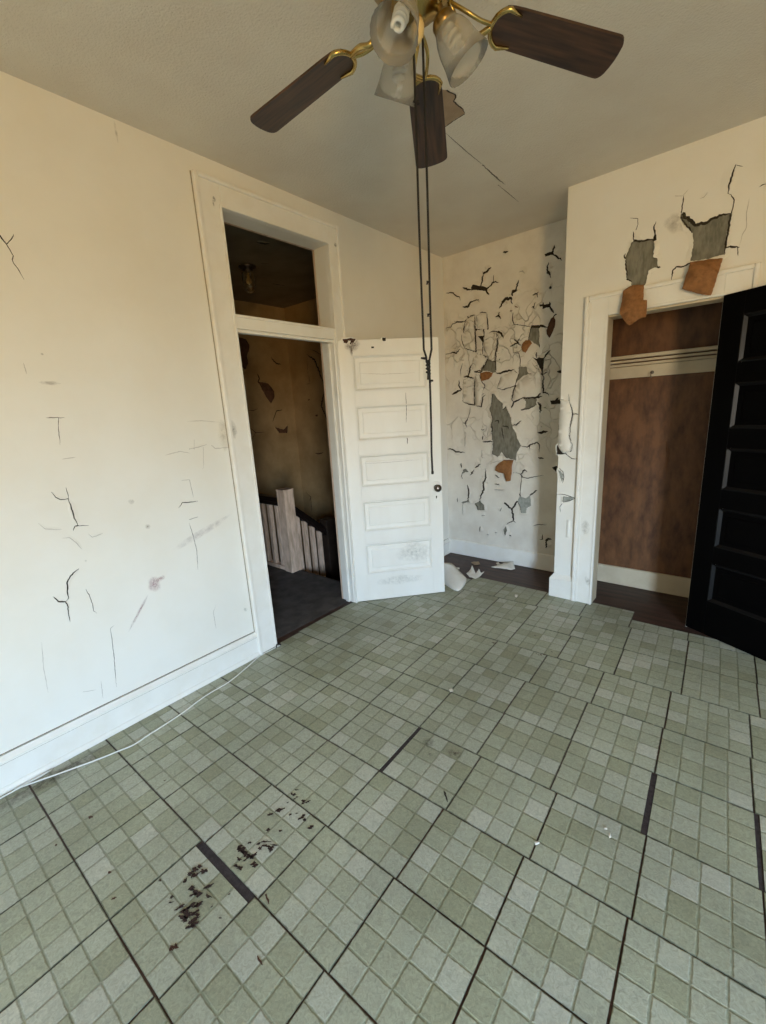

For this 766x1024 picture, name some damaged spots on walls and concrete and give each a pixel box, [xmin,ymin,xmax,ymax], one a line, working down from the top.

crack [446,132,519,202]
crack [0,232,24,279]
peeling [620,194,739,325]
peeling [474,300,562,482]
spalling [549,443,578,474]
spalling [455,463,473,515]
peeling [501,490,537,539]
spalling [556,492,575,512]
crack [38,489,116,696]